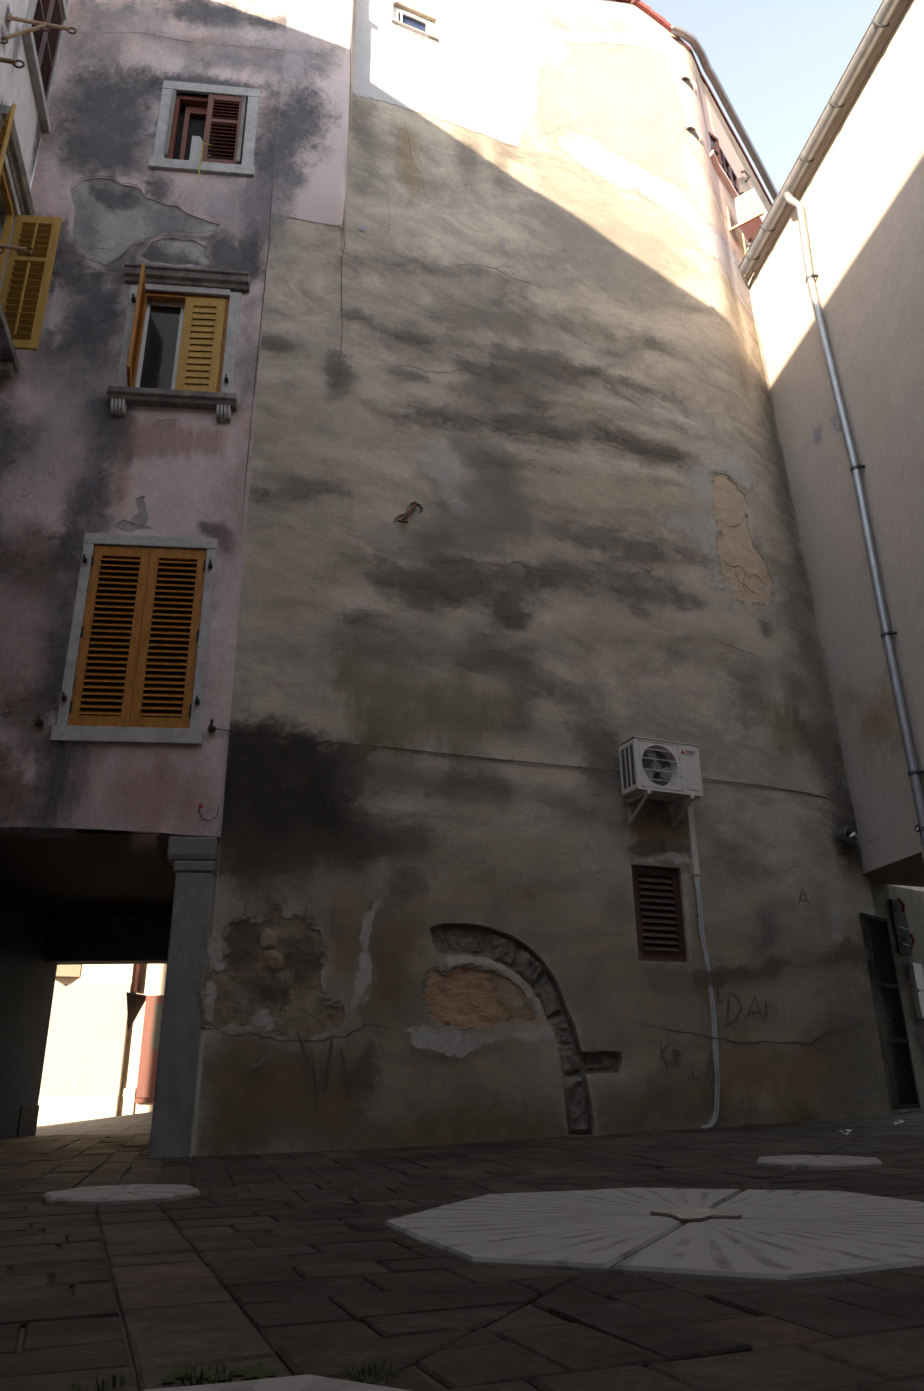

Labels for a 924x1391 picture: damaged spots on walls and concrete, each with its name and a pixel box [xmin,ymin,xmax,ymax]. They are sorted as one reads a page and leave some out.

water stain [1,6,20,60]
water stain [94,0,319,31]
peeling [348,0,749,250]
spalling [70,179,219,268]
water stain [0,47,331,831]
spalling [709,471,773,606]
water stain [219,716,507,902]
spalling [199,903,345,1043]
water stain [348,866,428,1021]
water stain [445,955,512,971]
spalling [419,963,539,1033]
crack [634,1021,843,1050]